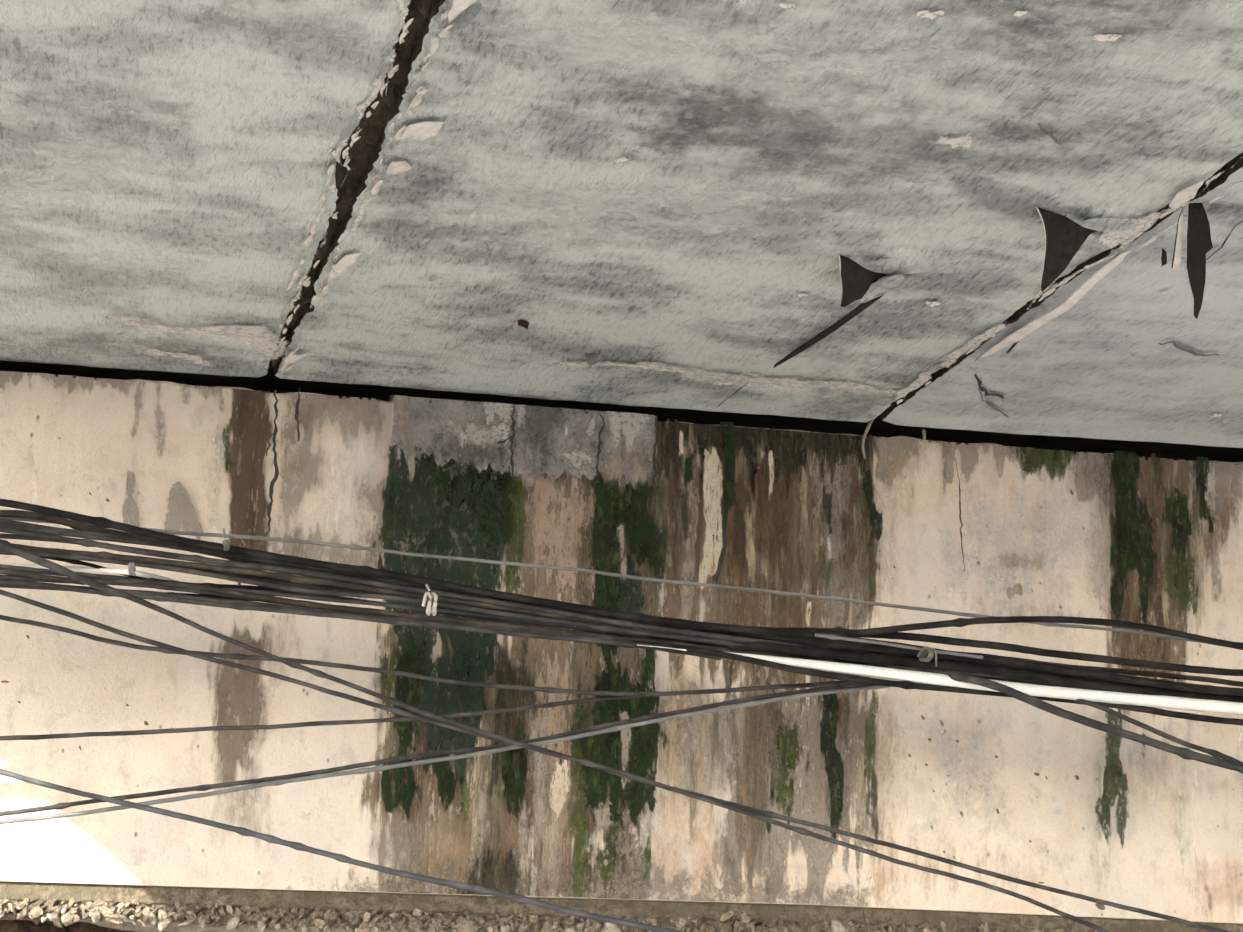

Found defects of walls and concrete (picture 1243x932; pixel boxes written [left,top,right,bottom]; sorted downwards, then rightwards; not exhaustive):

spalling [1091,34,1122,42]
spalling [936,134,973,150]
damp [183,384,389,568]
damp [506,419,1243,683]
peeling [560,165,1242,405]
crack [974,374,1009,418]
crack [1158,341,1219,356]
crack [1206,220,1243,260]
damp [208,626,271,808]
damp [361,623,879,903]